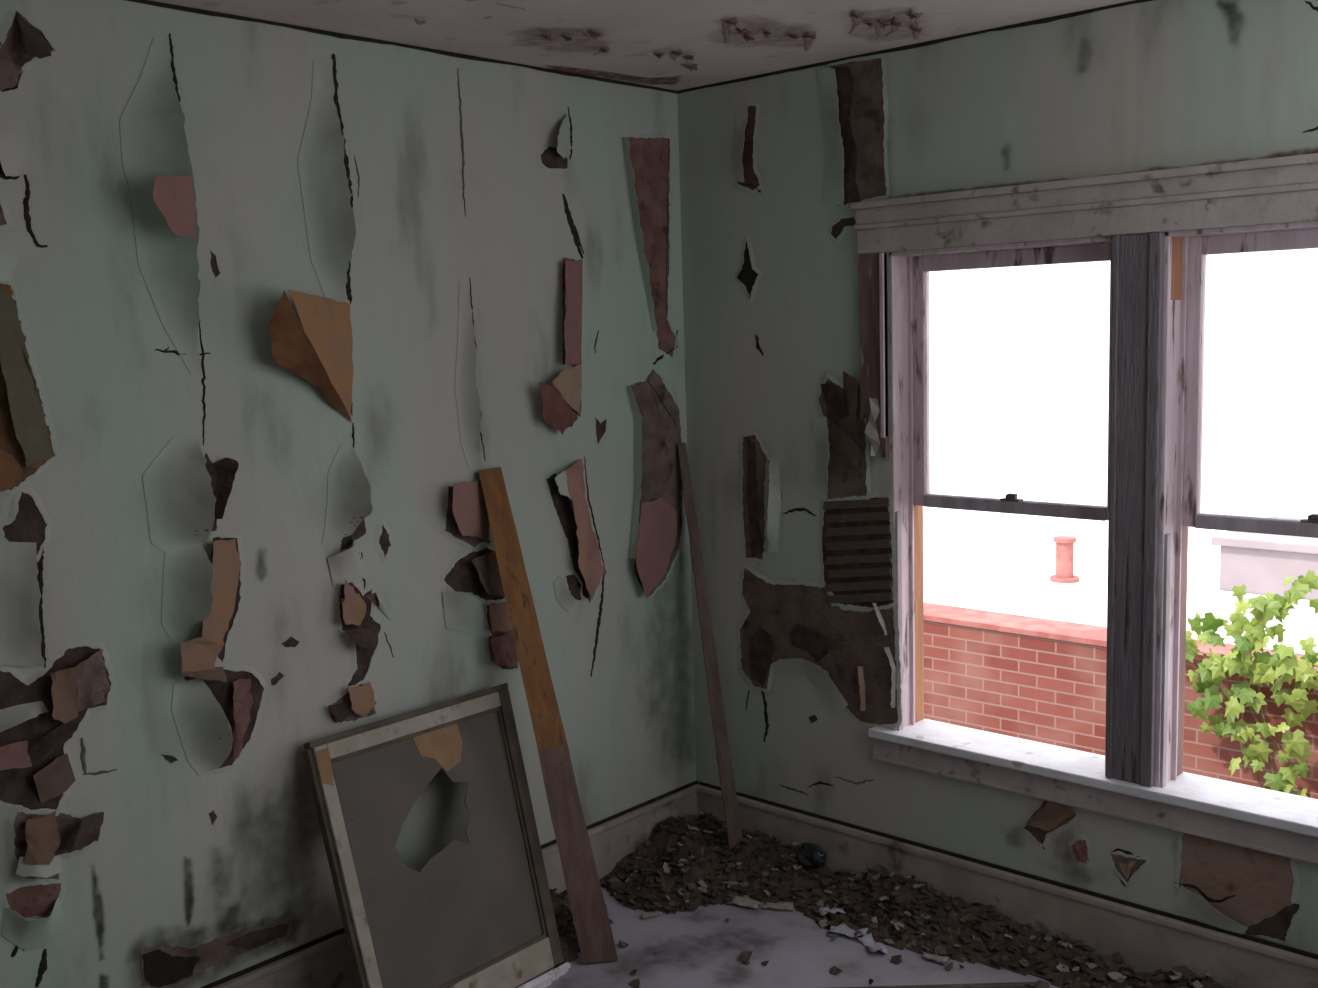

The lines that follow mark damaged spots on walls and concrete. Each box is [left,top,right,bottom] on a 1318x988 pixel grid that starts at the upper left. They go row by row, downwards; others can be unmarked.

crack [125,0,1154,217]
flaking render [629,137,676,358]
flaking render [828,58,887,244]
flaking render [0,283,55,553]
flaking render [546,473,591,602]
flaking render [630,369,683,598]
flaking render [740,377,898,725]
flaking render [0,646,111,862]
flaking render [183,572,284,768]
flaking render [6,873,61,918]
spalling [133,920,295,988]
spalling [1173,832,1300,943]